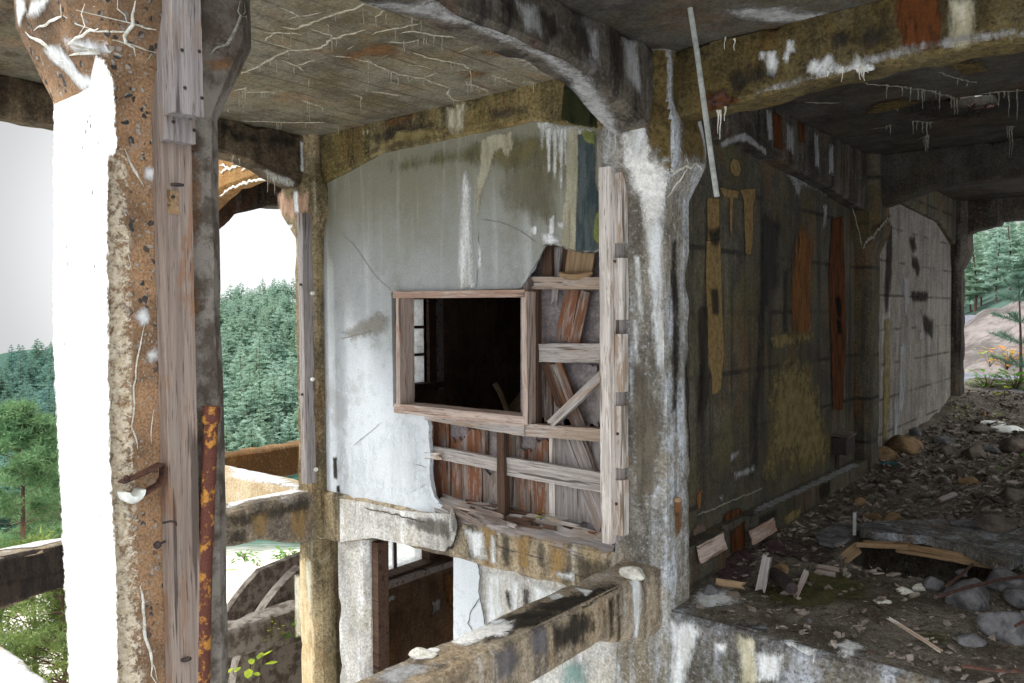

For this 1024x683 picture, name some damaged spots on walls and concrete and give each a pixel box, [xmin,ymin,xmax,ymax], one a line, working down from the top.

crack [25,0,156,64]
crack [209,2,536,134]
leakage [760,40,794,77]
leakage [808,56,874,82]
leakage [721,111,773,154]
leakage [814,134,834,174]
leakage [371,104,599,289]
leakage [633,243,653,358]